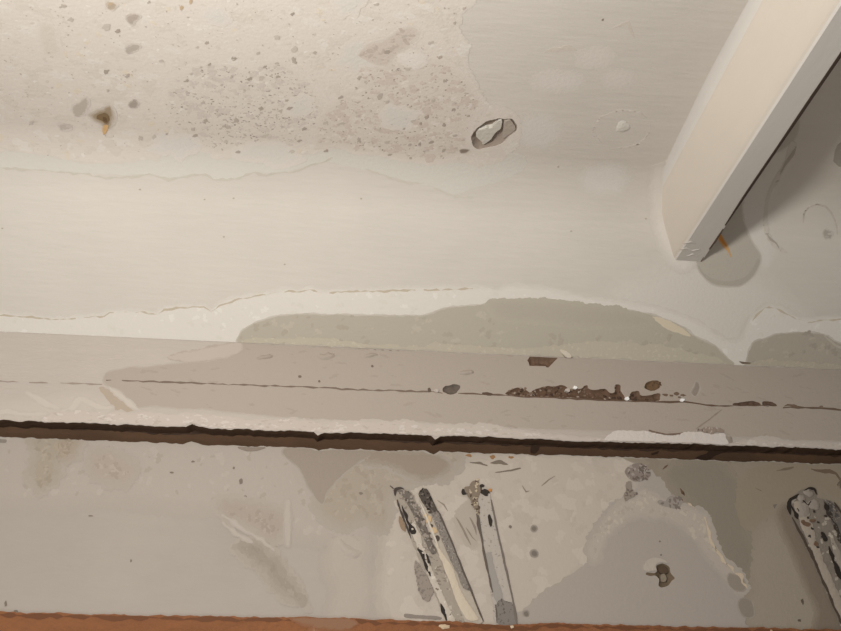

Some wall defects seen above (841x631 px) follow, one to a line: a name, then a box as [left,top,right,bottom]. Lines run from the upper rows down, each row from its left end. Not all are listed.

peeling [0,0,522,168]
damp [0,118,841,449]